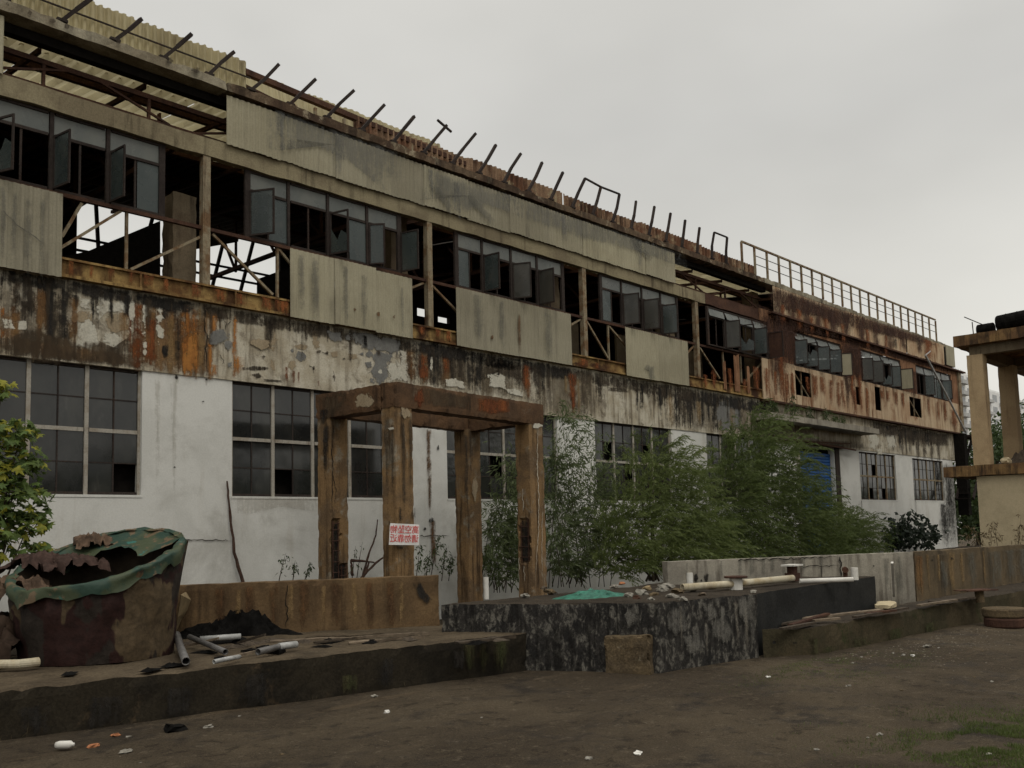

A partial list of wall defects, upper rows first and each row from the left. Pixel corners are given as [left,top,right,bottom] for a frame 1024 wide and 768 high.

rust [1,282,21,341]
peeling [2,319,27,330]
peeling [71,297,164,355]
rust [121,284,217,379]
rust [232,319,241,375]
spalling [288,334,409,408]
damp [0,269,864,448]
rust [704,286,958,427]